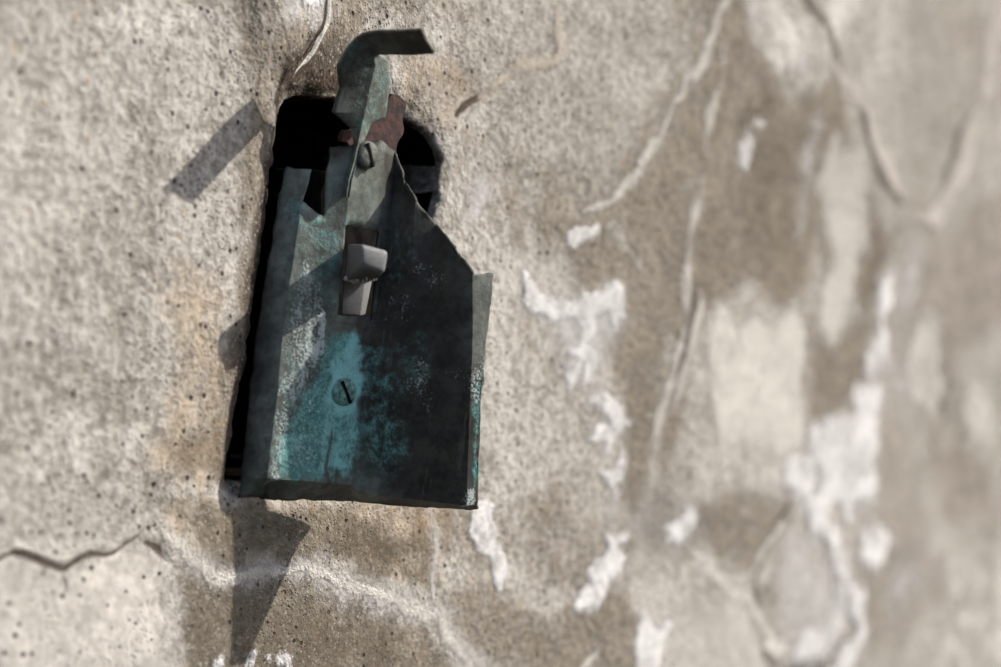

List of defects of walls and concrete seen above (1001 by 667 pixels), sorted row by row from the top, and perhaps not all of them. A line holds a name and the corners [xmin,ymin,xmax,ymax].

crack [286,0,332,88]
efflorescence [566,224,600,249]
efflorescence [522,268,632,497]
crack [0,522,166,572]
efflorescence [469,497,508,591]
efflorescence [573,532,629,613]
leakage [243,650,293,667]